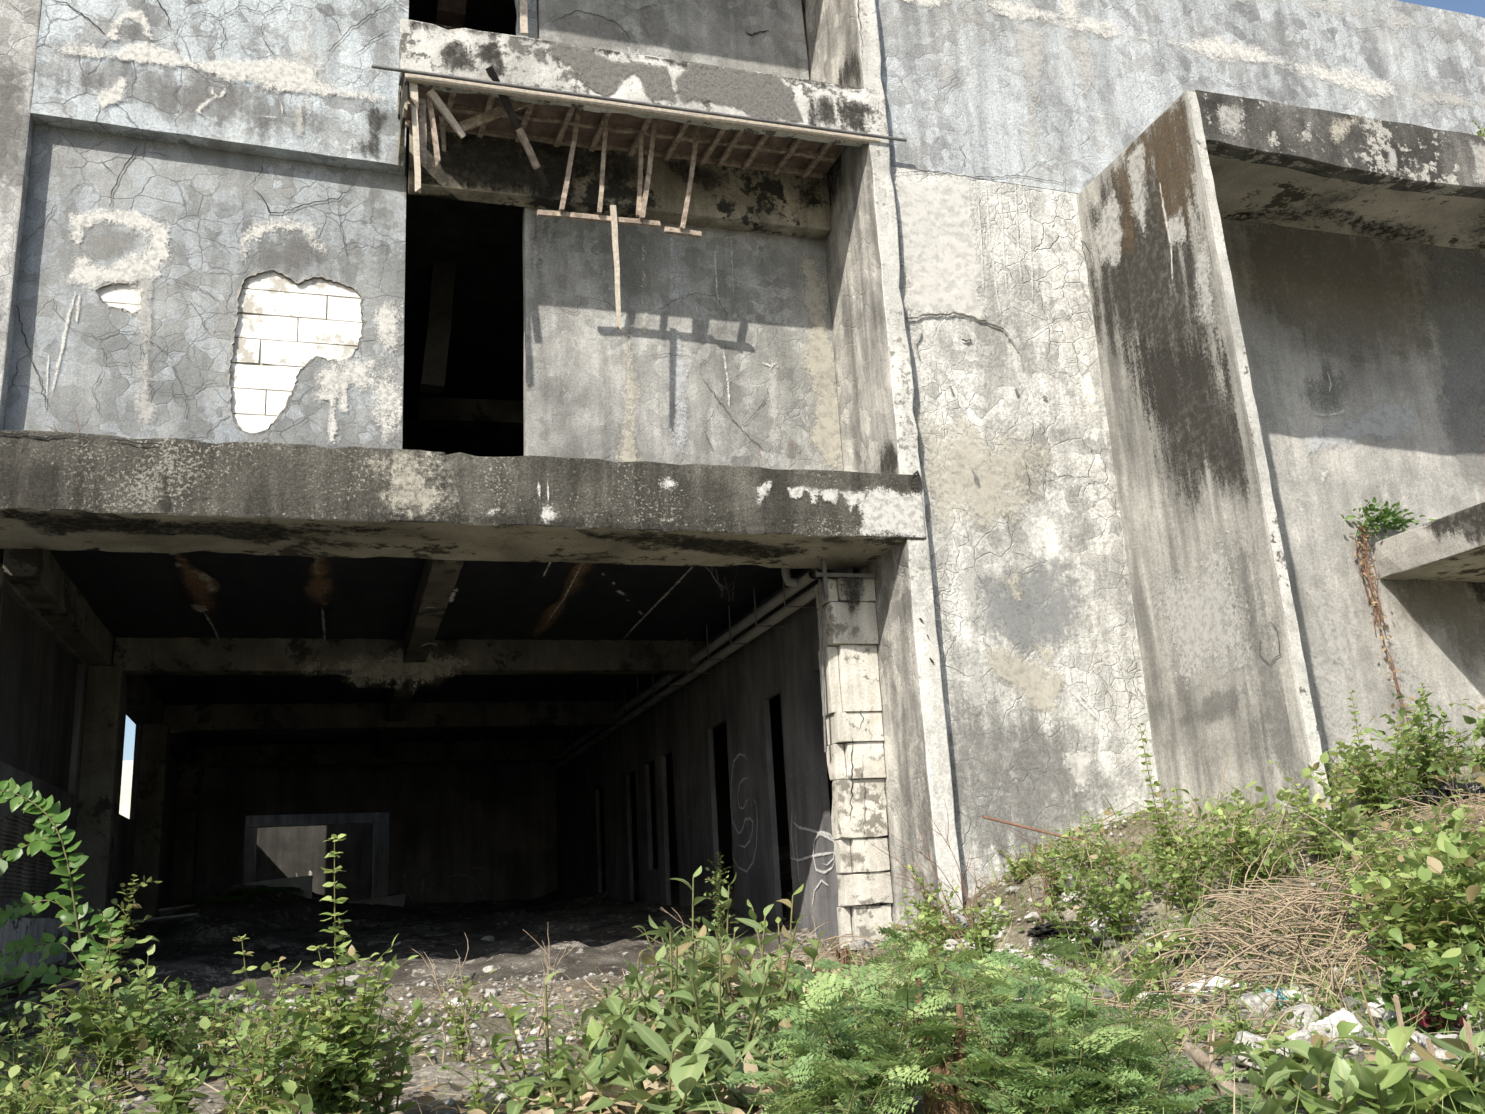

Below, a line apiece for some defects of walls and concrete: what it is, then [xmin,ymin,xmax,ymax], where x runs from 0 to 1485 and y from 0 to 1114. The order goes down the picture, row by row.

crack [10,0,109,37]
crack [157,0,393,58]
peeling [531,42,803,121]
crack [101,148,165,206]
crack [251,162,352,260]
crack [0,243,232,446]
flaking render [93,278,146,317]
flaking render [226,269,367,436]
damp [1086,166,1249,505]
peeling [757,470,926,538]